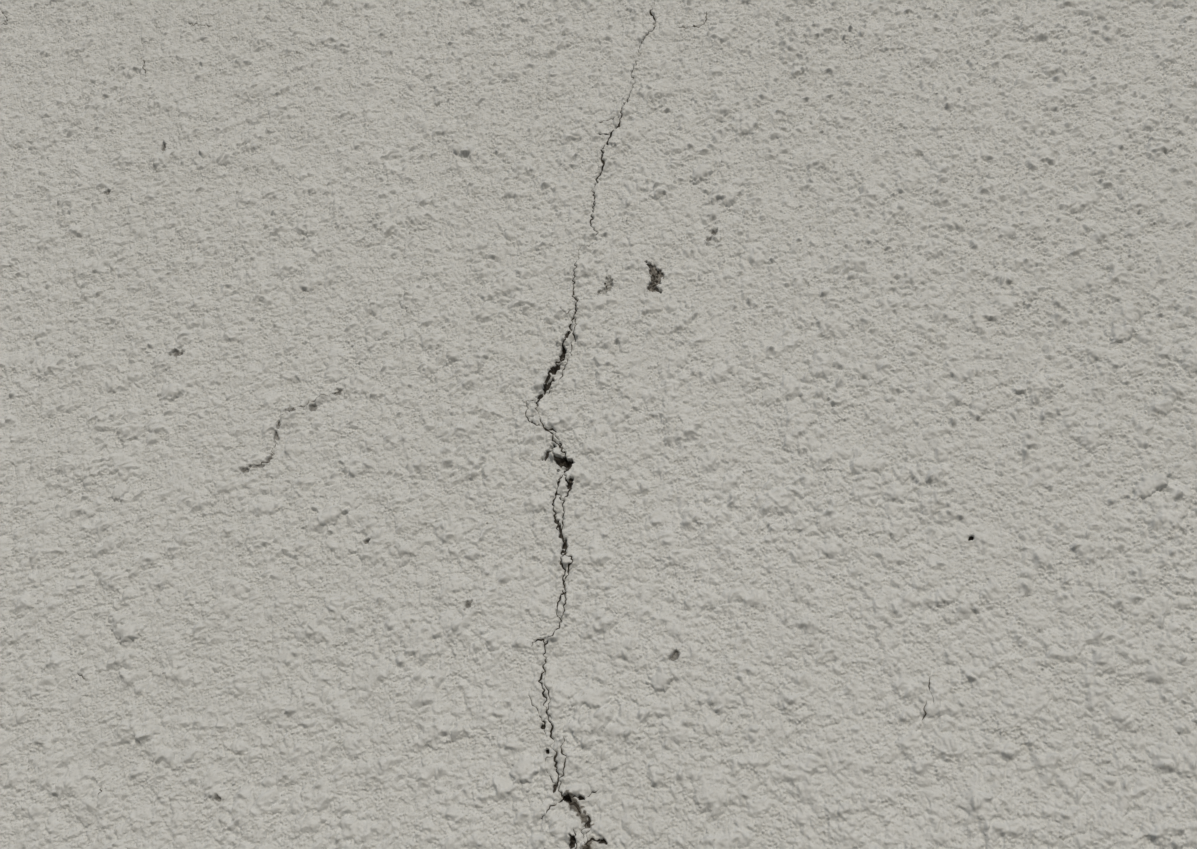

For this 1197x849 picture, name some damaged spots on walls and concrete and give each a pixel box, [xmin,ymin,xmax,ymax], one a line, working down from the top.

crack [525,3,707,849]